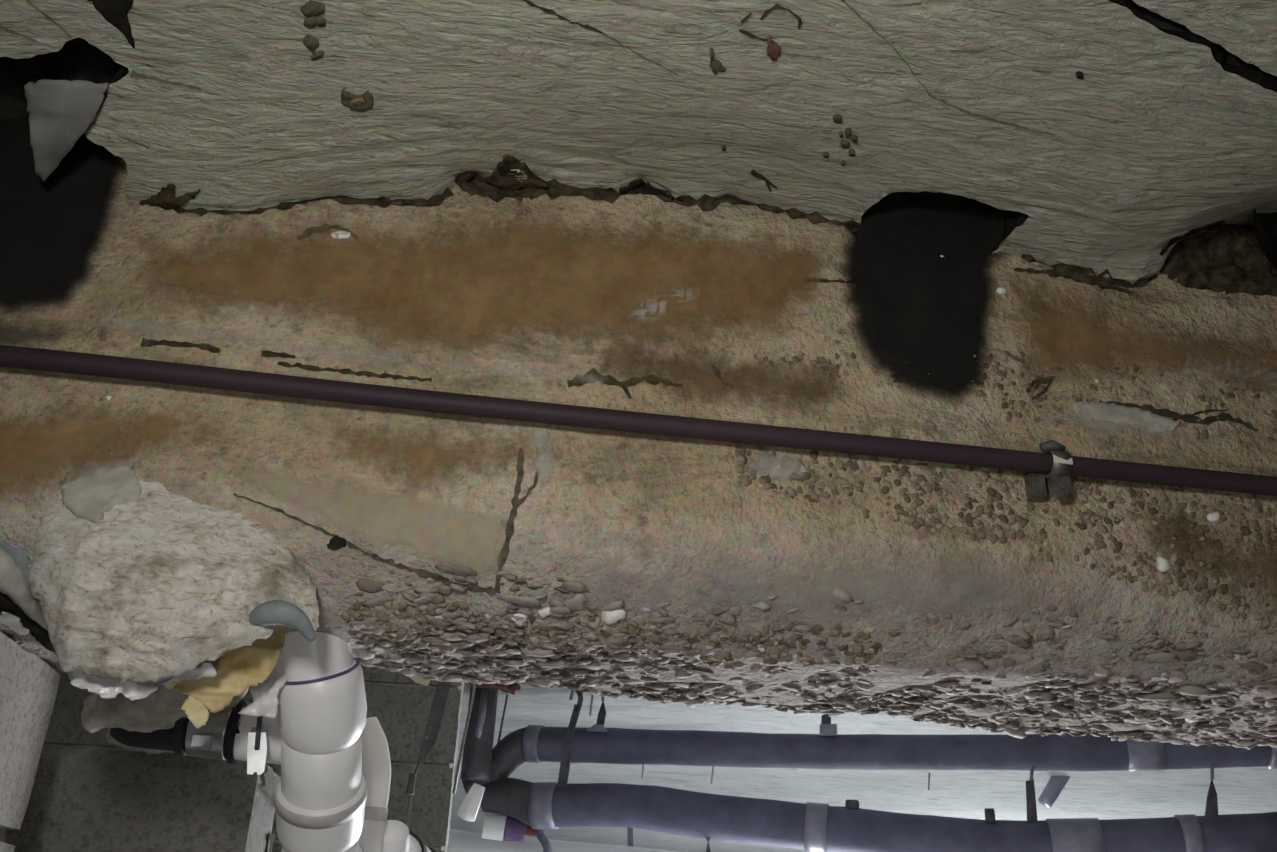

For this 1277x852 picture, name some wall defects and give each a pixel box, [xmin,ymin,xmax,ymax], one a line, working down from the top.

crack [523,0,678,75]
crack [841,0,1054,136]
spalling [1159,224,1277,297]
damp [636,292,692,316]
spalling [753,352,856,378]
crack [1099,400,1259,431]
crack [233,448,539,595]
spalling [336,443,1277,750]